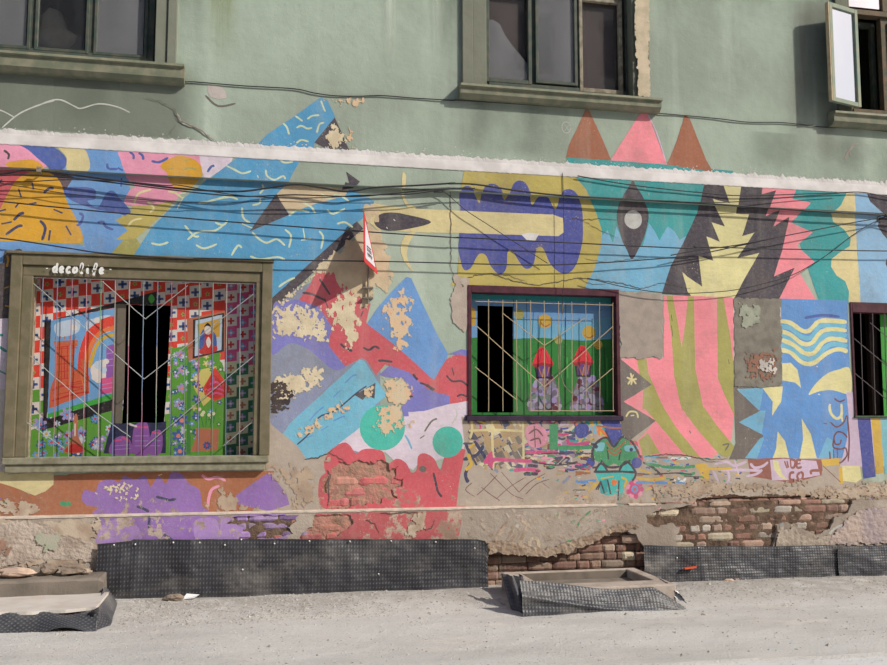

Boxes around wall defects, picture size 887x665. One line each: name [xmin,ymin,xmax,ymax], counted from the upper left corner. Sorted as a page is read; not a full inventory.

peeling [634,0,651,97]
peeling [325,122,355,149]
peeling [739,302,761,328]
peeling [270,366,324,413]
peeling [295,400,350,437]
peeling [364,377,415,437]
peeling [757,358,777,374]
peeling [103,482,139,501]
spalling [216,457,403,539]
flaking render [0,498,101,569]
peeling [405,511,426,538]
spalling [487,478,887,585]